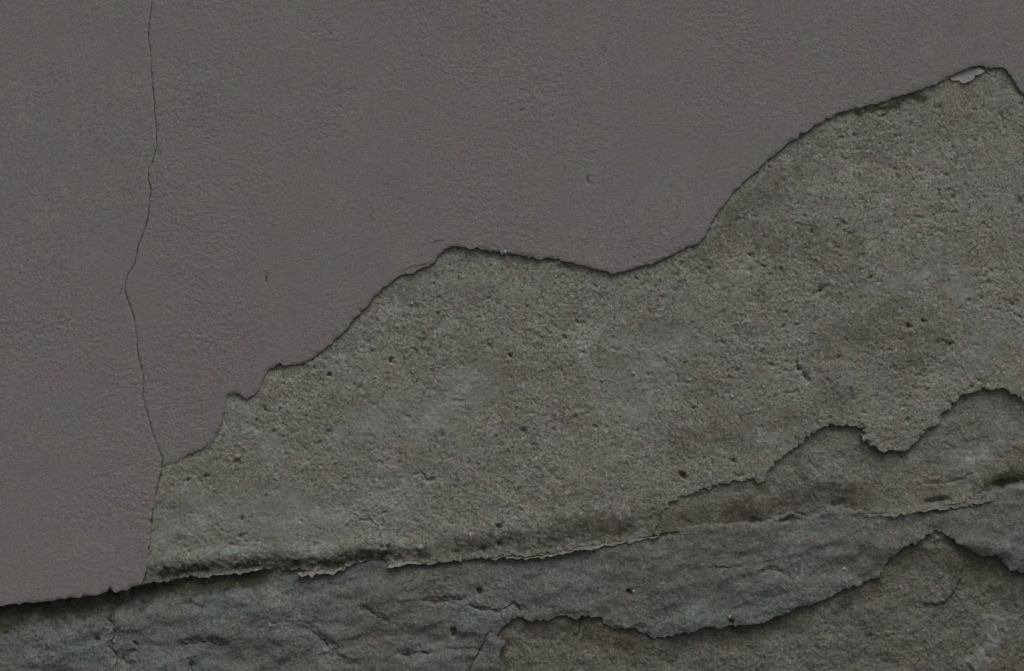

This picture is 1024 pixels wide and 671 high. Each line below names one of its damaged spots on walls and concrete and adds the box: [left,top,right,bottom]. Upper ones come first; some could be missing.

crack [120,5,163,579]
spalling [139,66,1024,586]
crack [719,566,795,579]
spalling [497,530,1024,671]